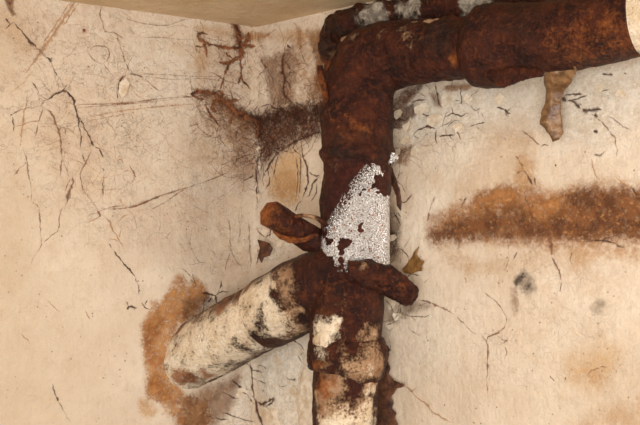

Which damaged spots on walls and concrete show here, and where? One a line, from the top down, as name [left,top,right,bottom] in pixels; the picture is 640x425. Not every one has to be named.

crack [88,9,159,99]
damp [202,91,319,138]
crack [400,86,485,144]
crack [6,19,148,309]
rust [428,185,640,247]
rust [142,276,239,425]
crack [421,292,513,390]